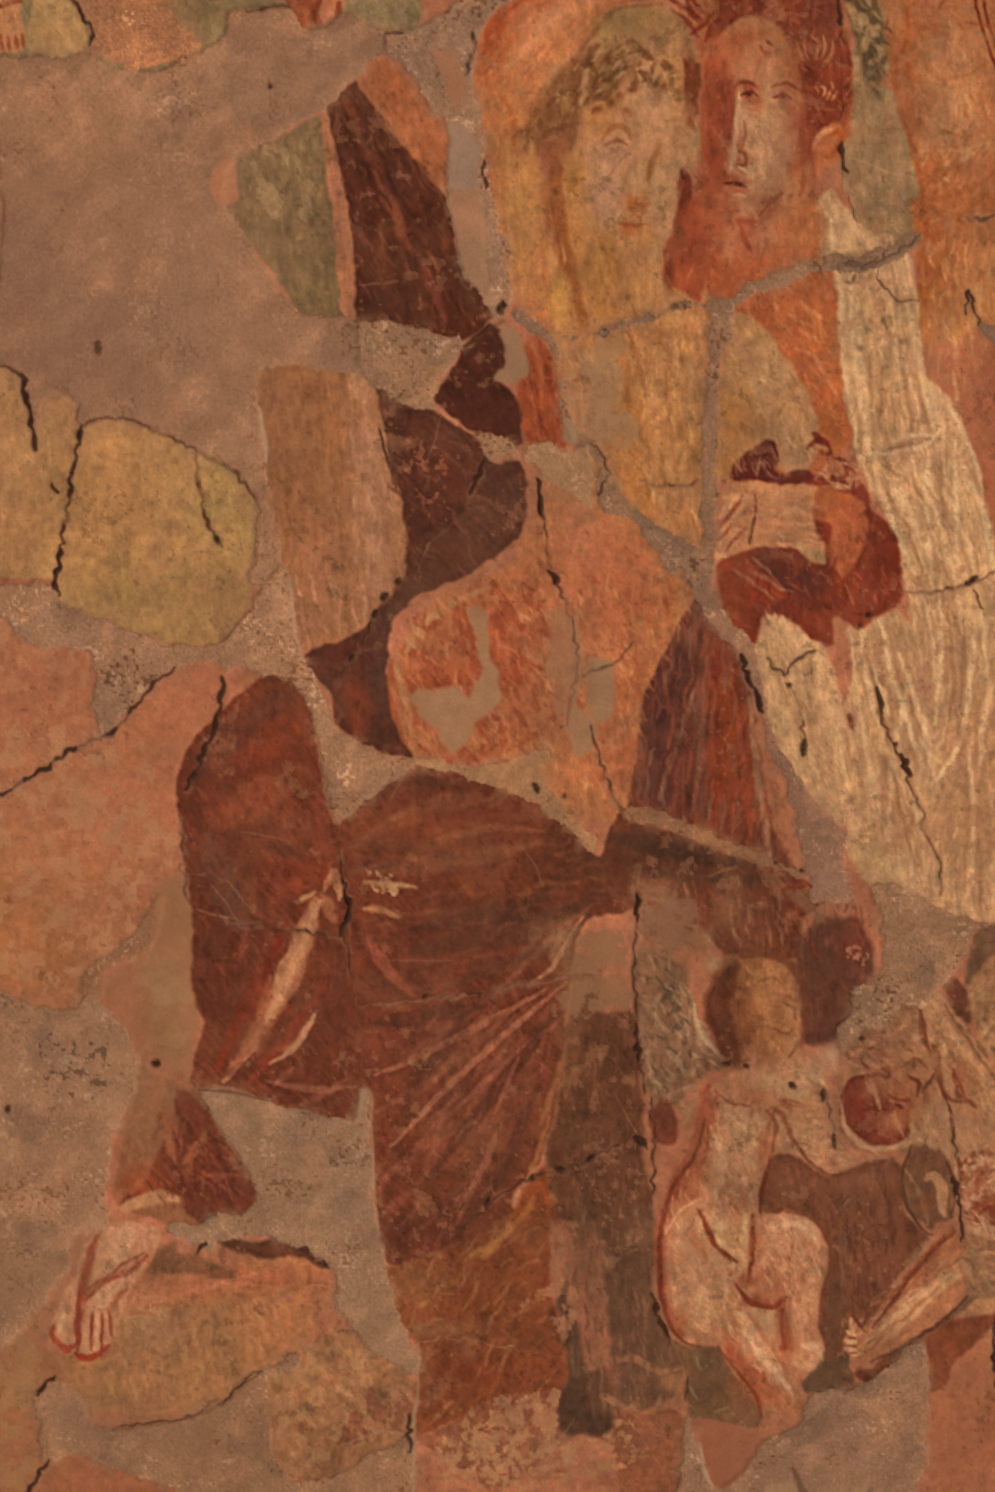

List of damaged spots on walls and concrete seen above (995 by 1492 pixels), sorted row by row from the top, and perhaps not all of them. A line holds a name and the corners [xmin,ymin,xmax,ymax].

crack [0,365,258,599]
flaking render [0,0,920,925]
crack [933,572,995,611]
crack [0,667,178,798]
crack [186,676,227,793]
crack [877,687,921,807]
crack [180,834,659,1214]
flaking render [838,883,992,1046]
flaking render [0,876,200,1350]
flaking render [167,1087,422,1375]
flaking render [678,1342,931,1492]
crack [987,1327,995,1373]